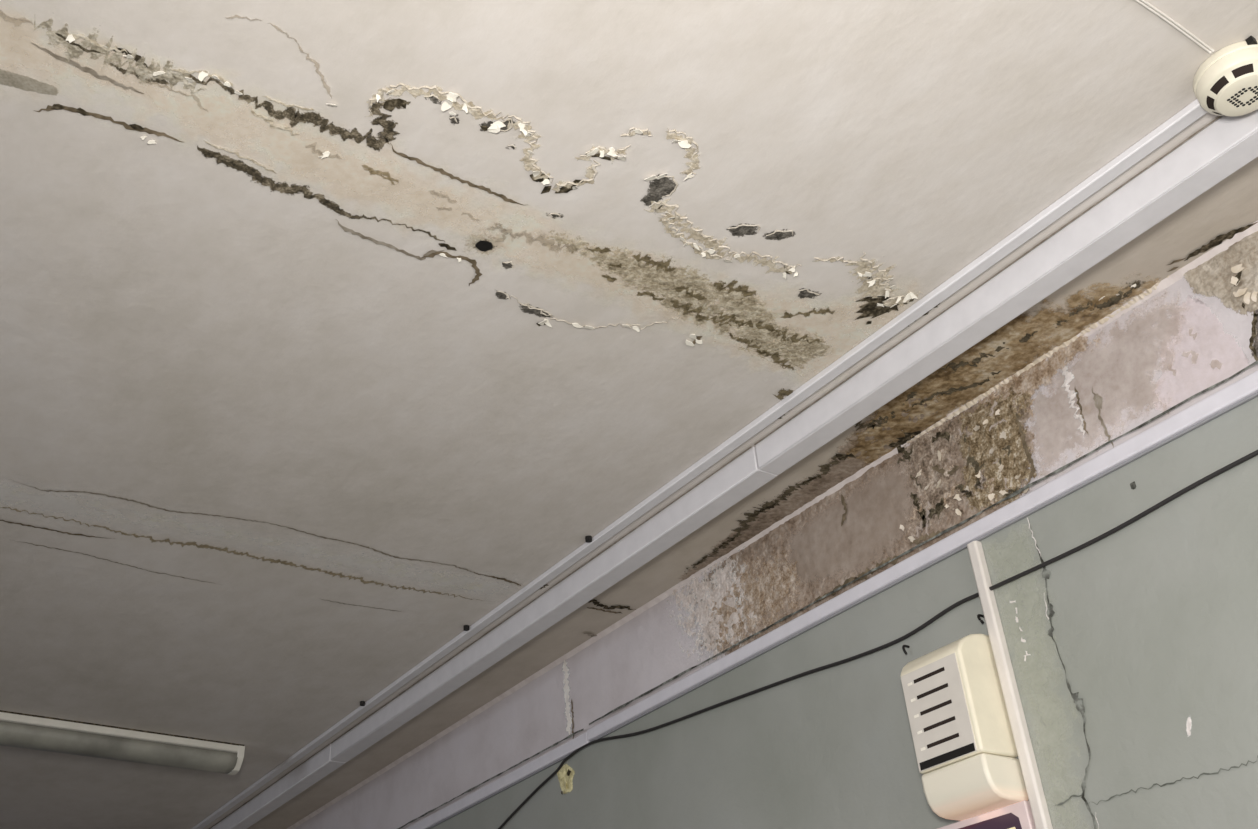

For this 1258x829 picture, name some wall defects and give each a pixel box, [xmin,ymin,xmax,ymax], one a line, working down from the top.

crack [33,104,482,285]
crack [32,19,523,205]
leakage [363,165,398,185]
peeling [366,83,923,324]
peeling [495,290,680,332]
leakage [544,230,835,371]
leakage [1029,304,1184,476]
leakage [1078,280,1144,311]
peeling [1152,231,1258,412]
crack [0,479,521,612]
flaking render [667,334,1100,667]
crack [1027,518,1258,829]